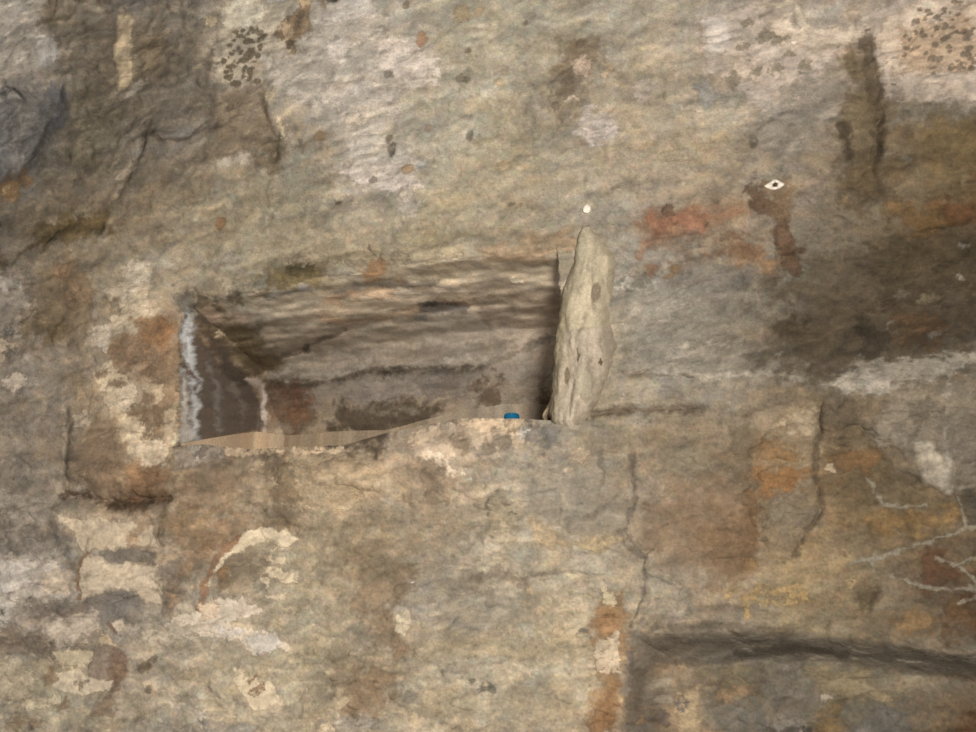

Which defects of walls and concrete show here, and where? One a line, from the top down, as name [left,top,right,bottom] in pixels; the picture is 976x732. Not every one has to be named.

corrosion [638,181,804,289]
peeling [137,527,299,673]
crack [619,454,668,637]
crack [794,403,825,556]
crack [867,479,927,509]
crack [850,485,976,605]
peeling [0,618,127,731]
peeling [233,667,289,723]